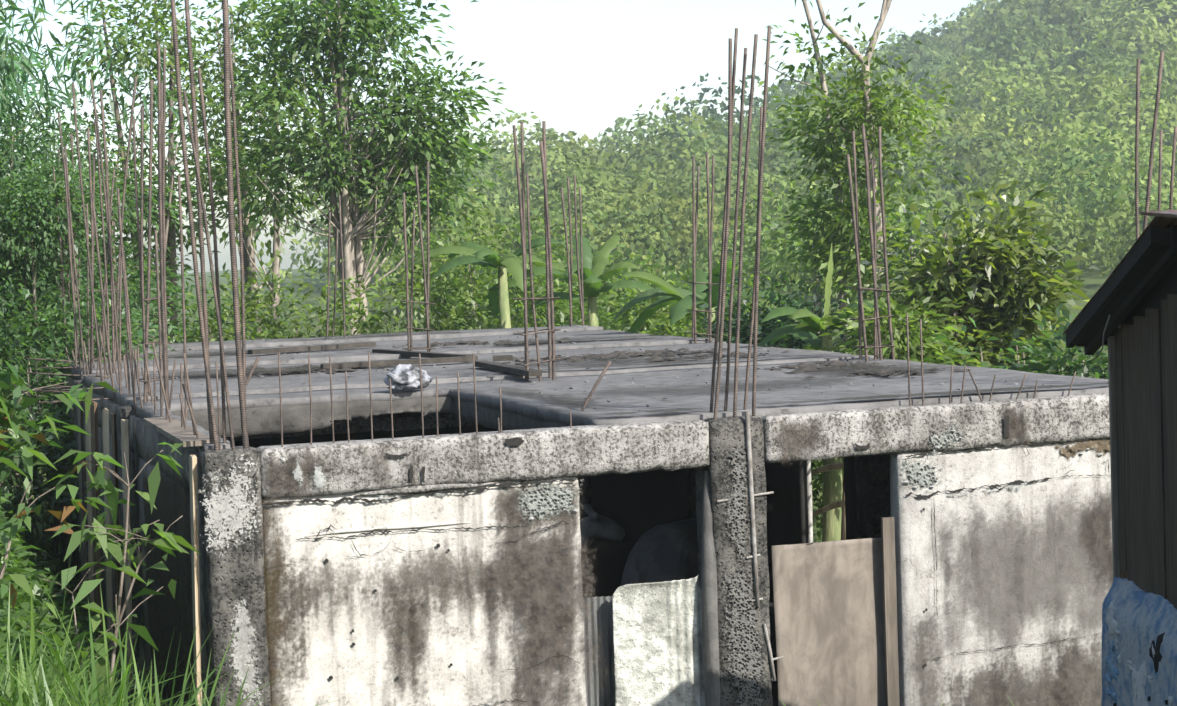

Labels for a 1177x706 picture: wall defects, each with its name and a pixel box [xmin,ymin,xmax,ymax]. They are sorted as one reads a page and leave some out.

water stain [227,456,358,706]
crack [253,472,578,568]
water stain [363,484,602,706]
crack [905,438,1110,661]
water stain [946,494,1113,706]
peeling [1105,600,1155,706]